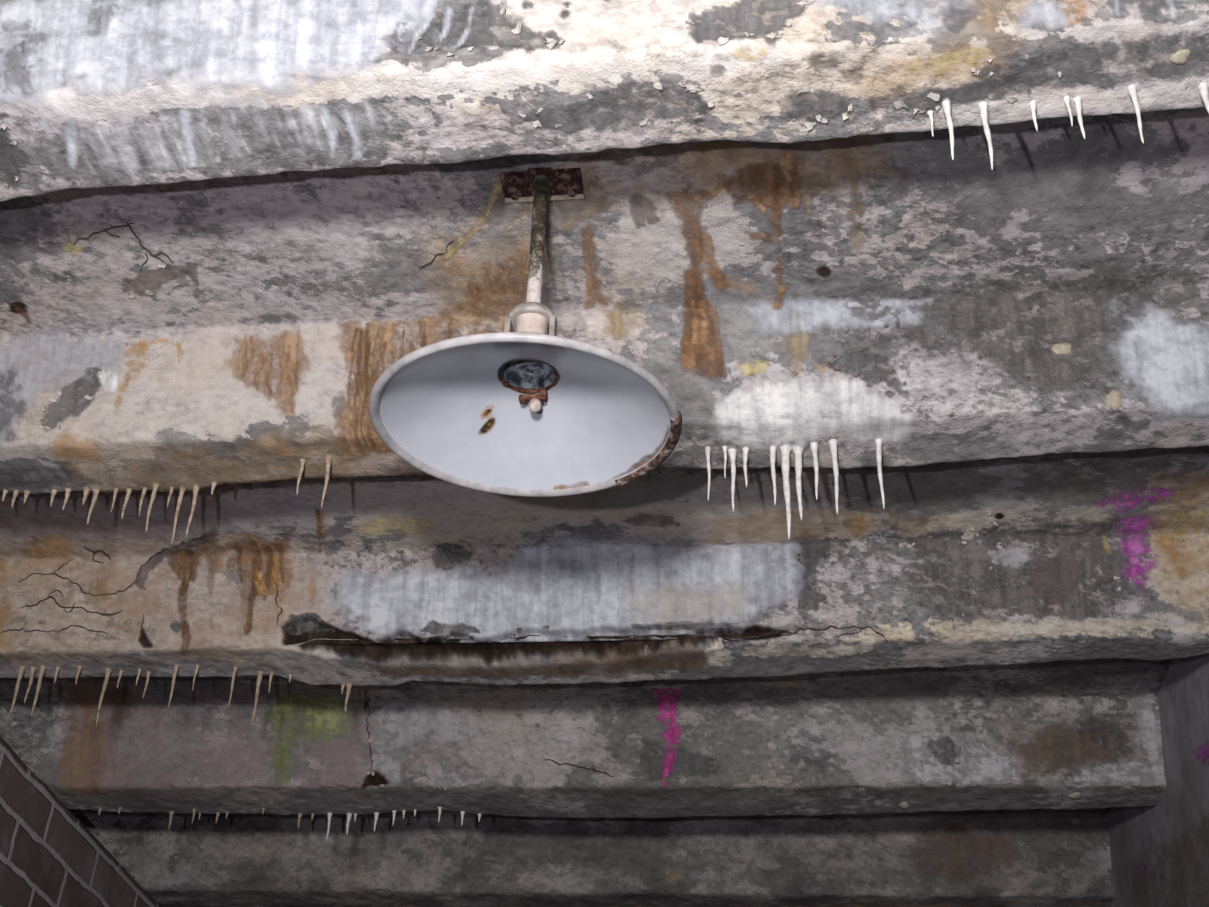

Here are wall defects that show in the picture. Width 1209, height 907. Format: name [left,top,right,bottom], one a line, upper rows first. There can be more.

damp [0,0,440,104]
peeling [407,0,565,56]
peeling [685,0,815,45]
crack [74,223,173,270]
peeling [123,263,198,298]
corrosion [668,153,810,379]
corrosion [338,316,456,455]
damp [713,265,1209,449]
crack [0,547,137,635]
corrosion [169,533,291,648]
damp [333,536,803,642]
spalling [282,613,875,678]